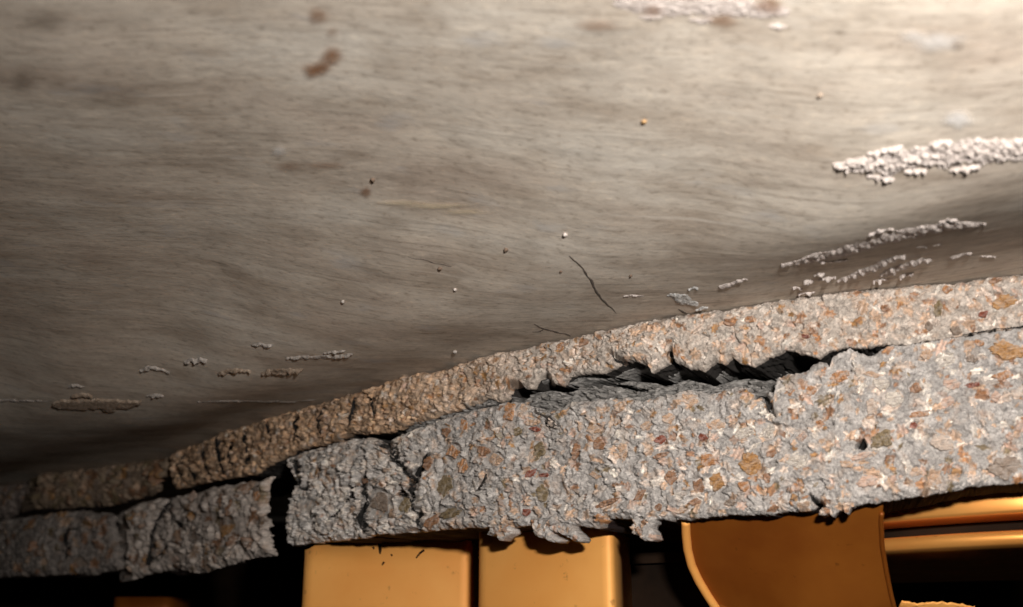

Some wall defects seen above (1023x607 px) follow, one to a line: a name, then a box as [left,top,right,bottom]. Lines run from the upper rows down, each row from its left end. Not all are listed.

rust [308,51,338,75]
crack [569,256,616,313]
crack [963,326,1023,335]
crack [347,393,378,431]
crack [379,351,790,530]
crack [145,407,326,566]
crack [329,471,371,532]
crack [63,524,79,559]